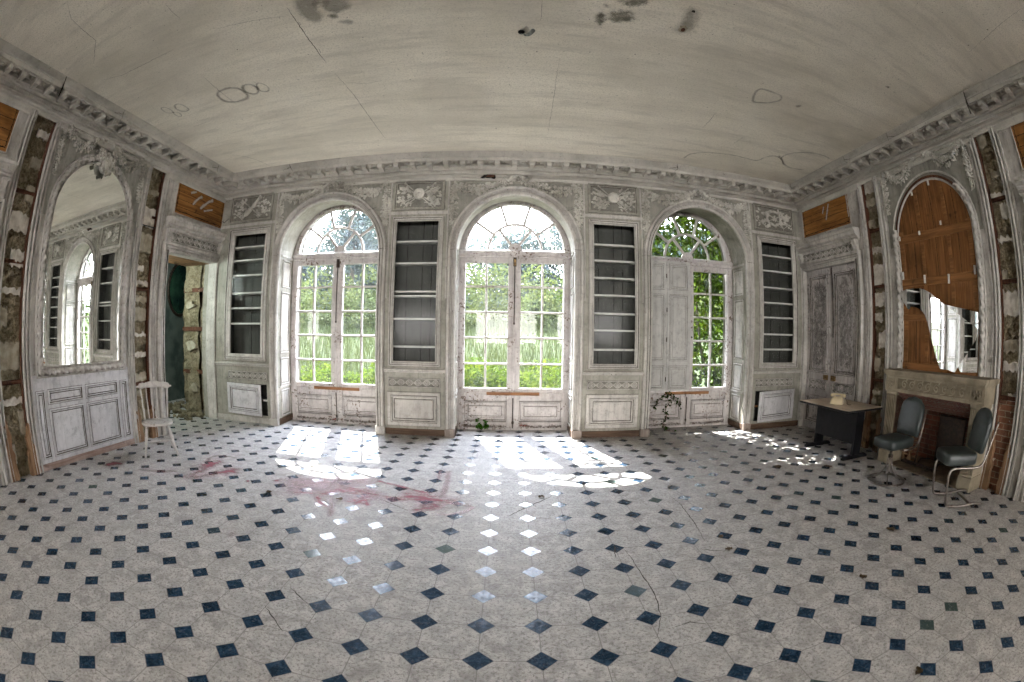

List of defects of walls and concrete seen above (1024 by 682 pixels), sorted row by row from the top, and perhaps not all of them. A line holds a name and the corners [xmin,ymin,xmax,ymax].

leakage [597,0,646,24]
peeling [36,129,50,142]
peeling [8,184,35,235]
peeling [143,189,159,230]
peeling [990,168,1009,220]
peeling [9,248,25,269]
peeling [135,264,148,337]
peeling [872,246,885,349]
peeling [1001,269,1019,317]
peeling [0,286,21,372]
peeling [1003,339,1019,373]